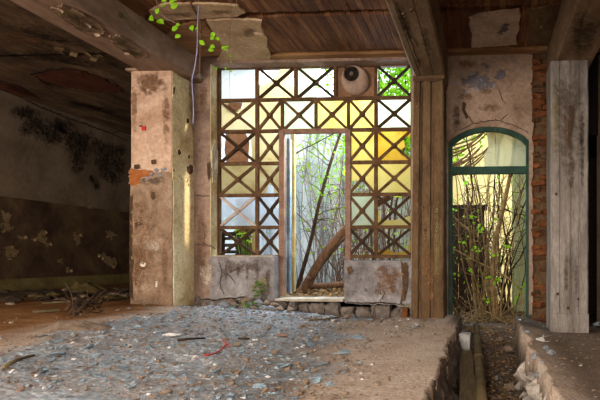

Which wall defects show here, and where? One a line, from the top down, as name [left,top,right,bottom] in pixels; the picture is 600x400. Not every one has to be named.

peeling [50,3,147,60]
spalling [29,67,125,93]
peeling [451,61,505,119]
crack [454,86,528,134]
spalling [128,148,194,187]
spalling [529,55,547,323]
peeling [0,209,52,247]
crack [195,229,245,302]